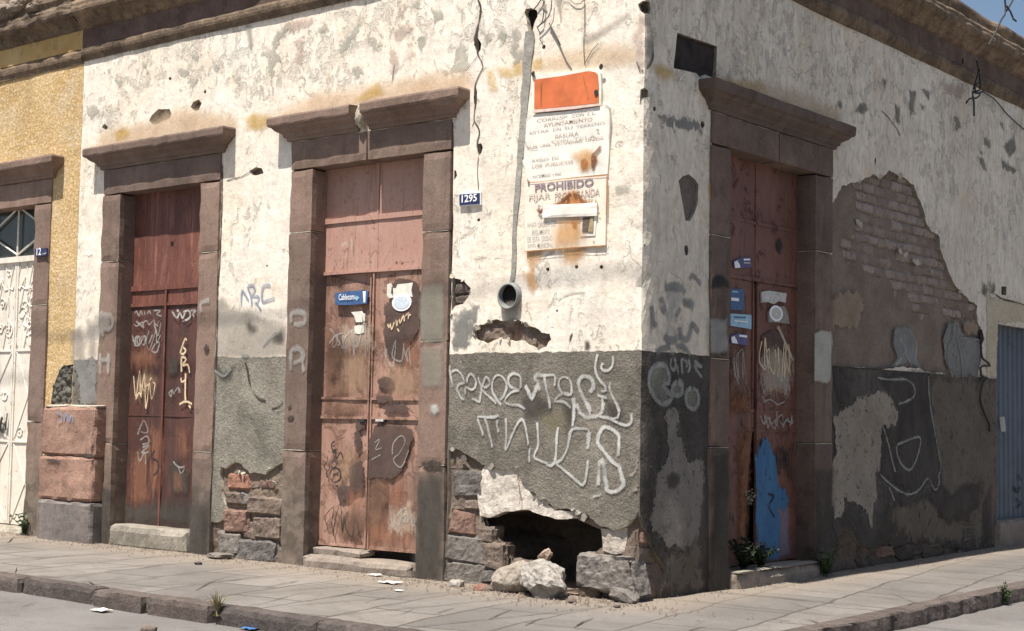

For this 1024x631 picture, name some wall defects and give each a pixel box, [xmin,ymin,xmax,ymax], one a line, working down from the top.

crack [466,0,483,191]
spalling [153,110,171,124]
rust [576,146,601,170]
rust [555,190,600,214]
rust [556,219,594,261]
rust [527,251,540,289]
spalling [472,318,551,350]
spalling [832,172,1024,572]
spalling [213,463,283,563]
spalling [421,407,705,601]